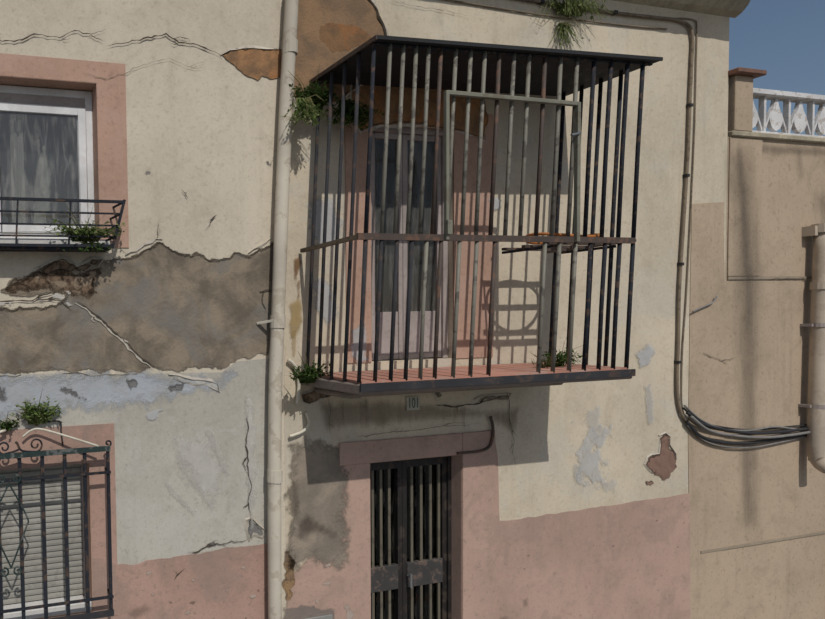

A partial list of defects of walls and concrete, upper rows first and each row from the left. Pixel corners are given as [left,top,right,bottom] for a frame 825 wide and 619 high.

crack [0,30,222,79]
flaking render [221,45,282,80]
flaking render [293,0,489,141]
crack [0,292,155,369]
flaking render [0,237,274,420]
crack [174,421,252,580]
peeling [282,438,350,600]
flaking render [644,431,677,485]